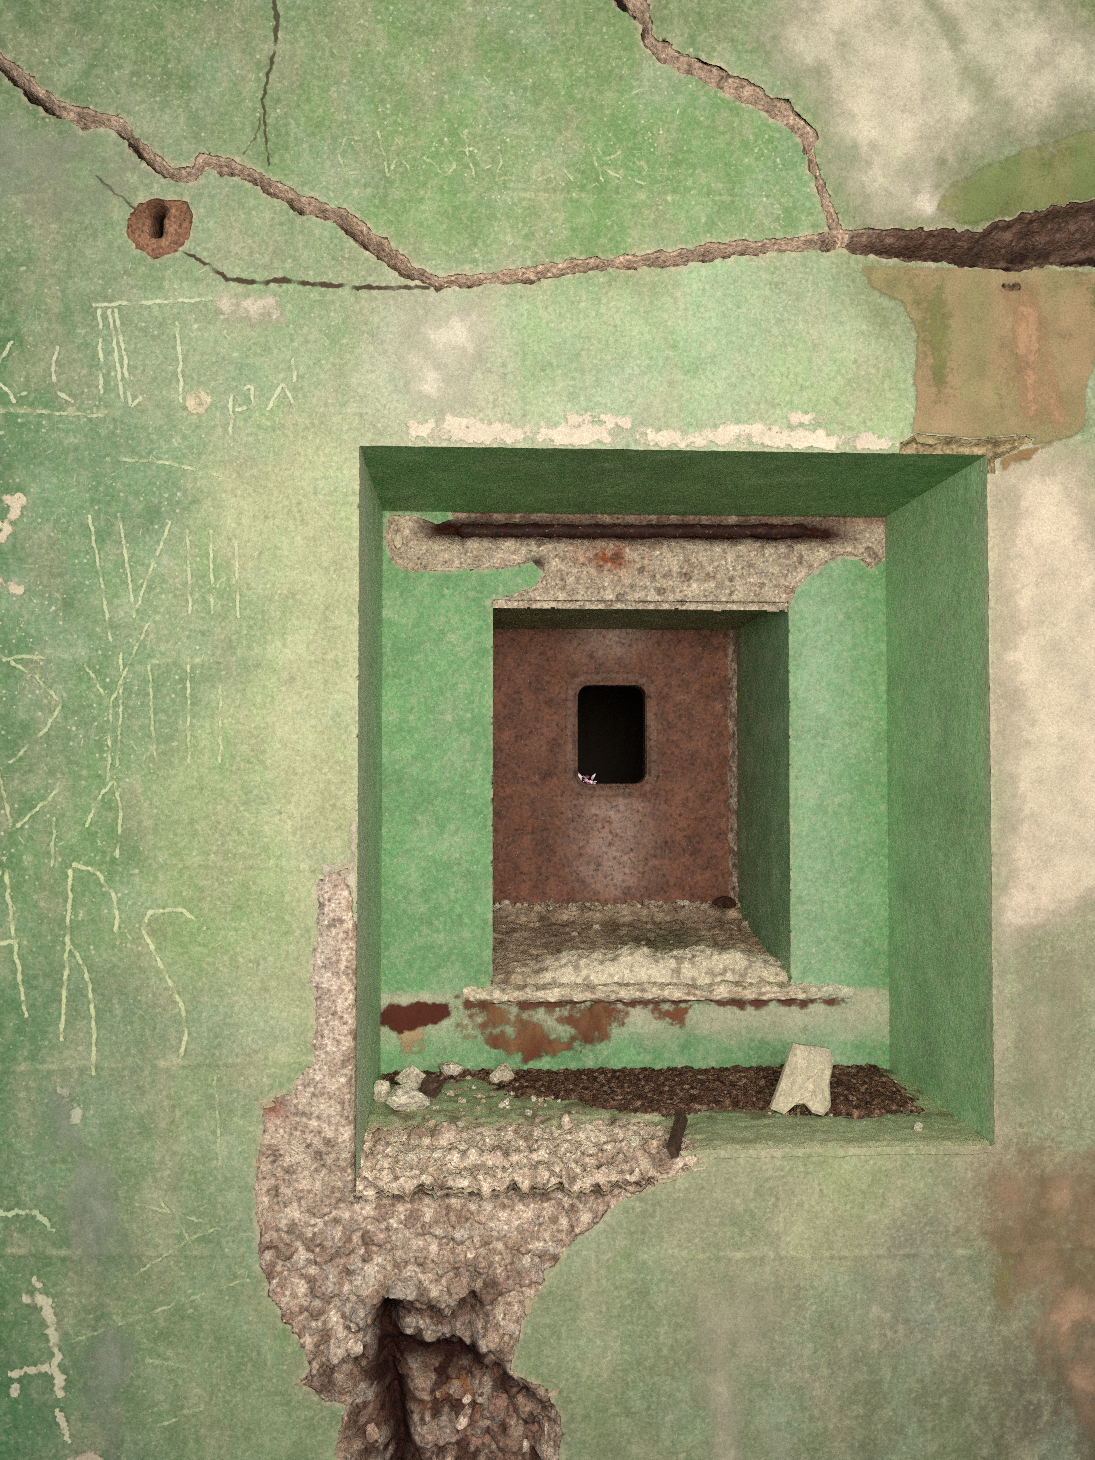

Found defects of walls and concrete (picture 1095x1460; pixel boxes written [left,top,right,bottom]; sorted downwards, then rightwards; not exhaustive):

spalling [126,198,193,259]
crack [0,0,1095,317]
leakage [764,0,1095,225]
peeling [407,410,1032,478]
spalling [384,512,886,612]
leakage [862,266,1095,952]
rust [380,994,847,1069]
spalling [253,794,708,1460]
peeling [0,1208,56,1233]
peeling [8,1276,103,1460]
leakage [701,1293,773,1460]
leakage [858,1273,909,1362]